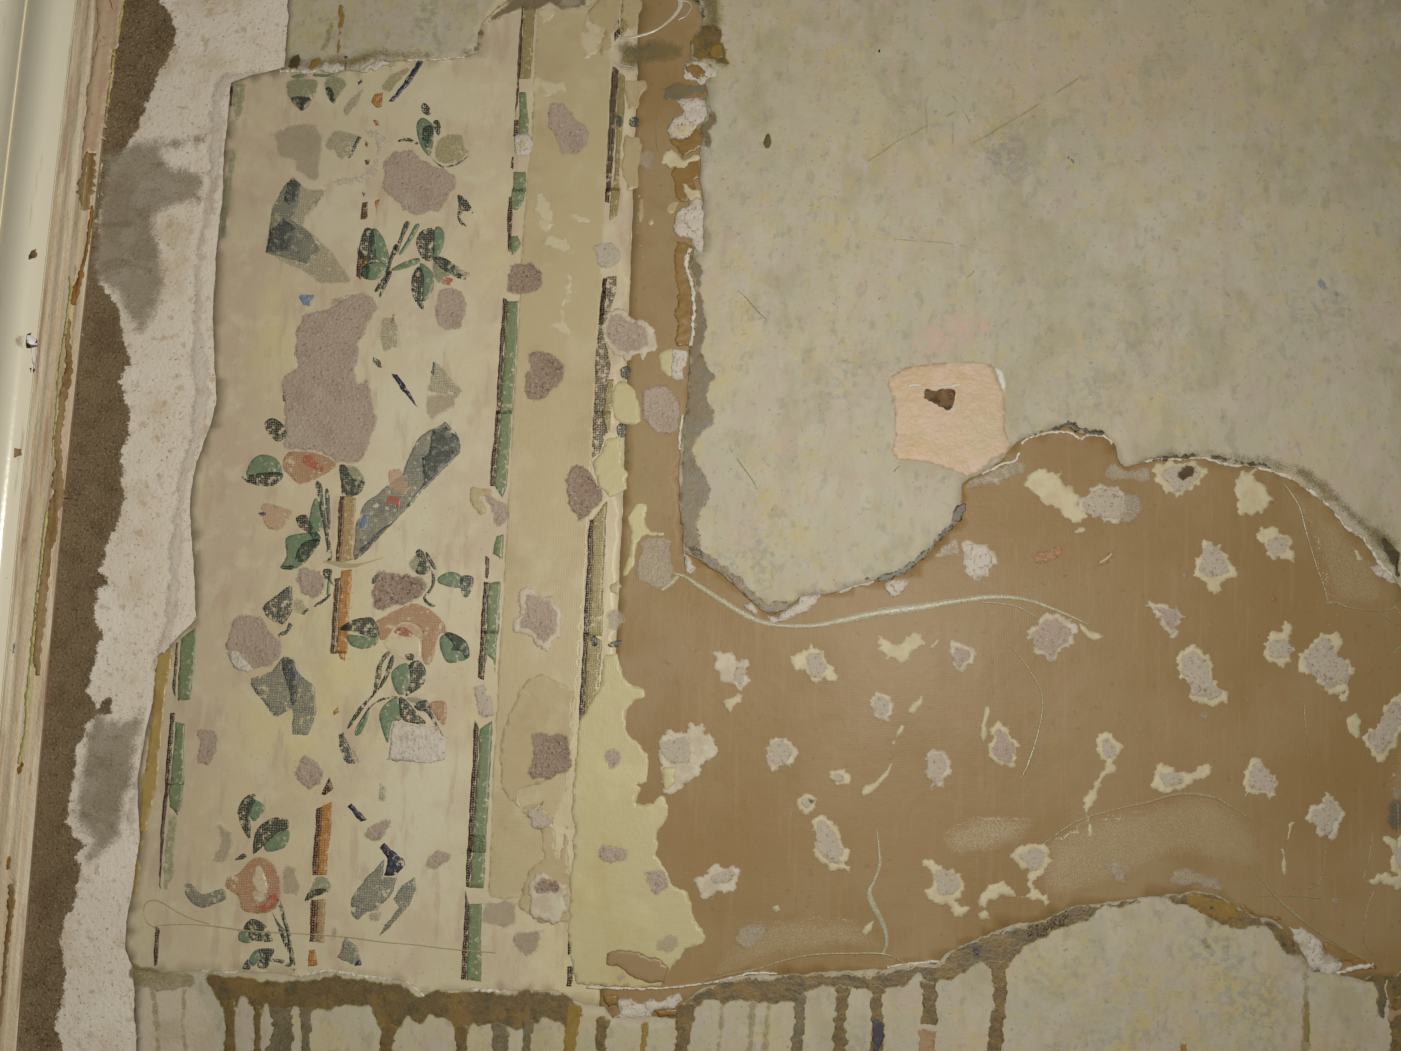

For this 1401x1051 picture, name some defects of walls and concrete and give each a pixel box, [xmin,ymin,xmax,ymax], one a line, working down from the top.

spalling [282,292,377,464]
spalling [566,308,688,522]
leakage [18,0,178,1051]
peeling [1023,468,1144,533]
peeling [1234,468,1296,563]
spalling [1263,621,1401,763]
peeling [473,654,741,988]
spalling [922,843,1054,921]
leakage [129,963,611,1051]
leakage [640,1021,649,1051]
leakage [673,898,1141,1051]
leakage [1159,889,1311,1051]